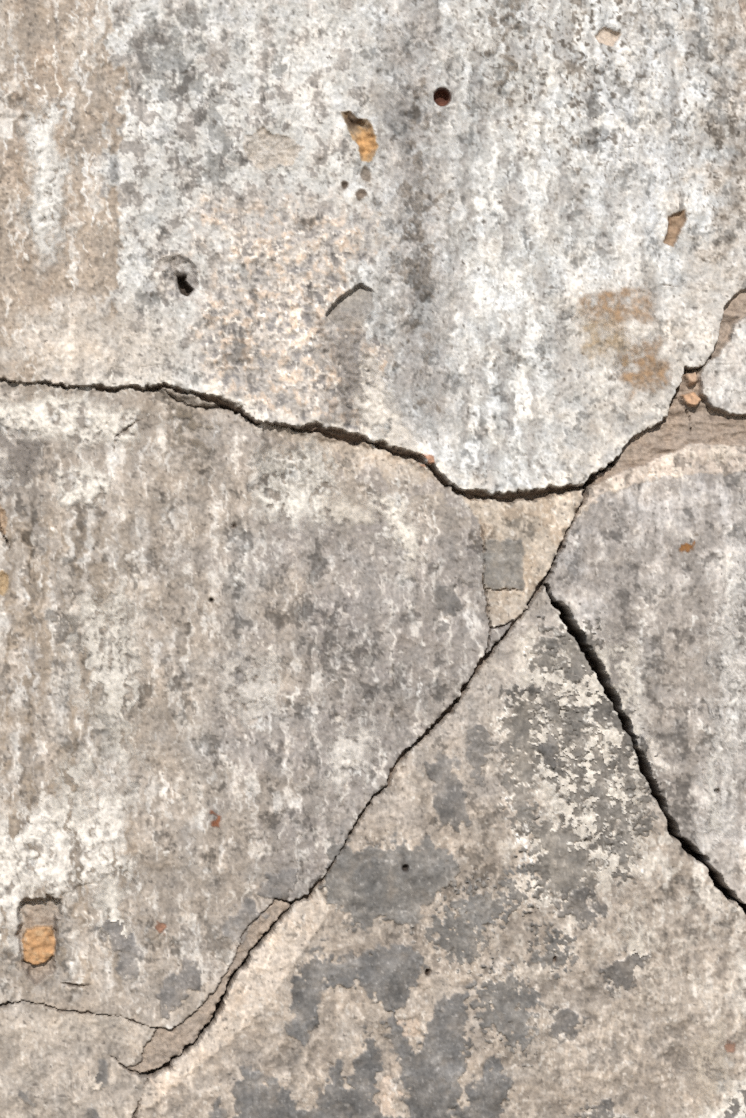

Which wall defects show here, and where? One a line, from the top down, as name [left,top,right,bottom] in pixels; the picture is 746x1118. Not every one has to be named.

peeling [434,575,466,634]
crack [0,357,746,1118]
peeling [209,612,662,1118]
spalling [14,893,64,987]
peeling [94,920,145,981]
peeling [95,1059,109,1088]
peeling [85,1108,101,1118]